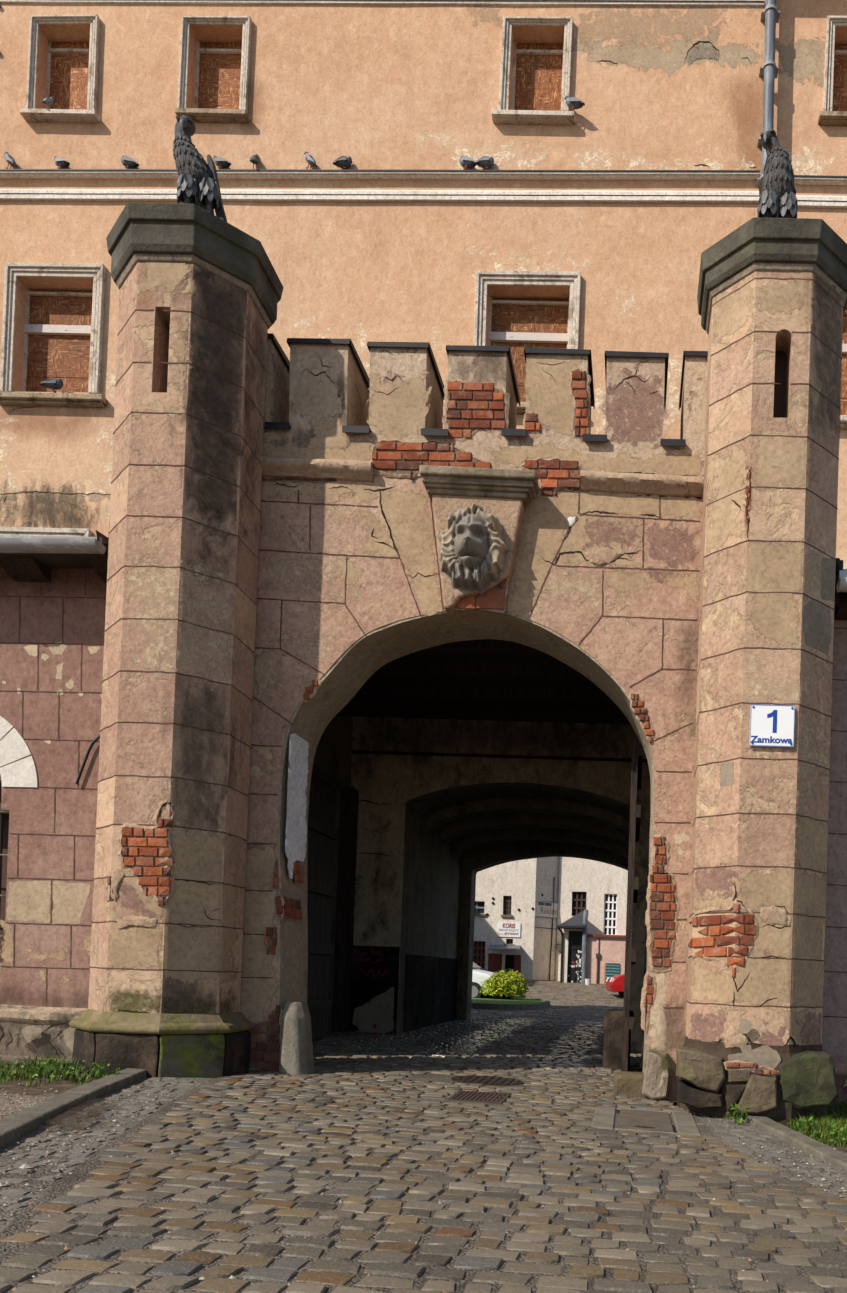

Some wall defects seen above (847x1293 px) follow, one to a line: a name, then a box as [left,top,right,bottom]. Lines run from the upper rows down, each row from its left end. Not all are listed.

flaking render [572,6,825,87]
flaking render [470,245,590,279]
flaking render [712,272,820,342]
damp [186,270,254,531]
damp [5,488,81,528]
crack [269,483,437,578]
flaking render [120,313,835,1077]
flaking render [0,775,304,1073]